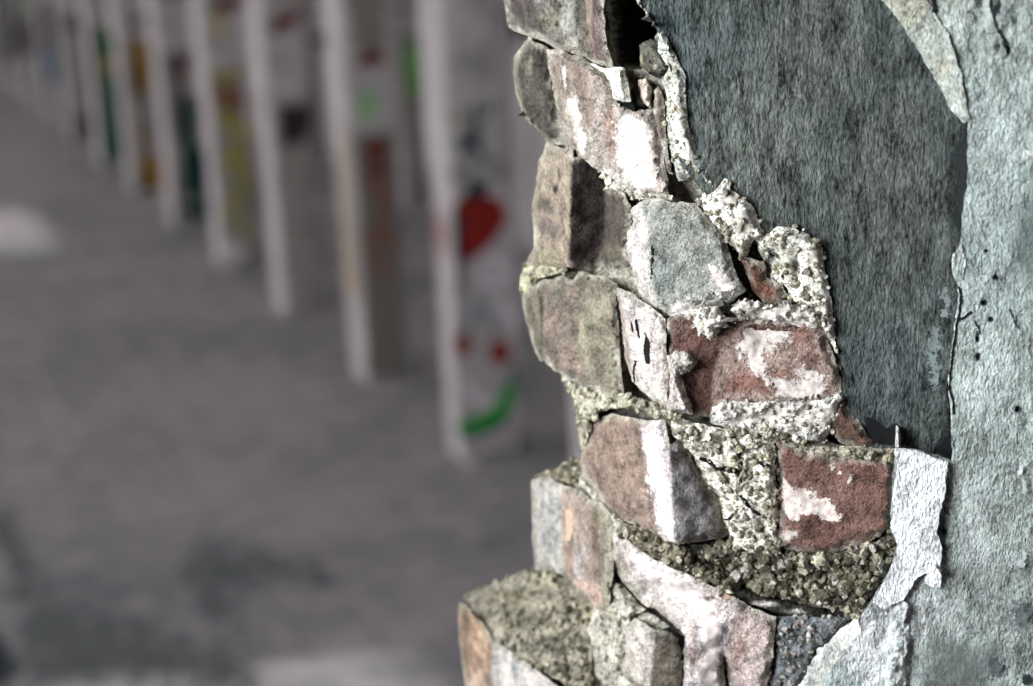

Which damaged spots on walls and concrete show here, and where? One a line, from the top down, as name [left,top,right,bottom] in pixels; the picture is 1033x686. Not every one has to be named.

spalling [458,0,970,686]
crack [931,0,940,22]